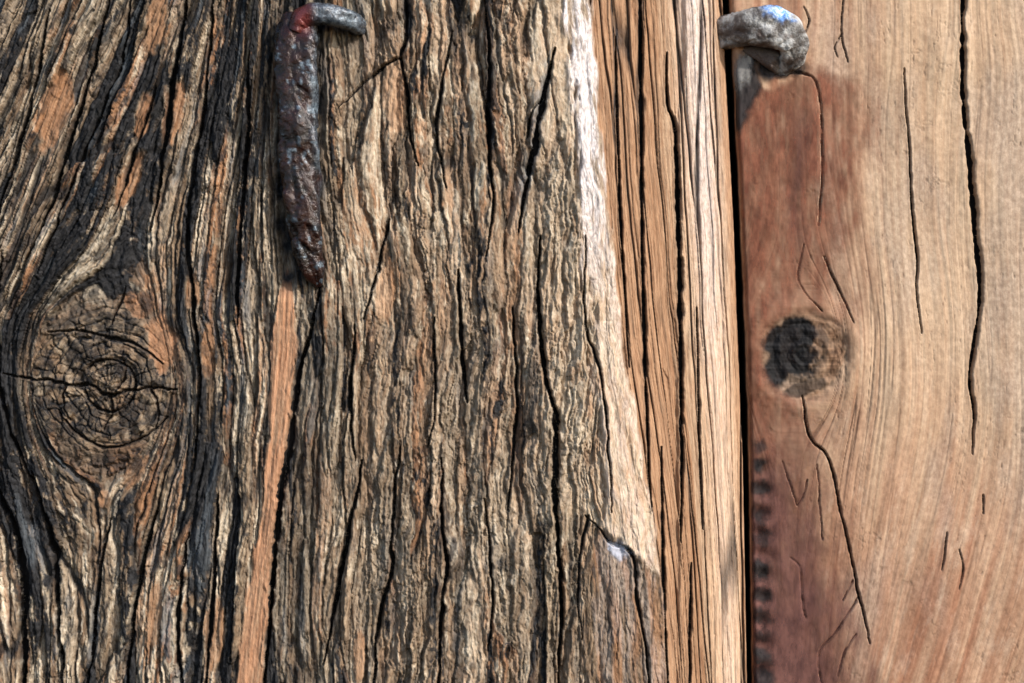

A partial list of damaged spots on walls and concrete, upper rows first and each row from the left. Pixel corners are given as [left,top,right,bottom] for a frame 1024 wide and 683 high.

crack [0,0,219,683]
crack [484,50,564,683]
crack [615,0,702,683]
crack [785,396,869,676]
crack [903,69,921,330]
crack [959,0,982,441]